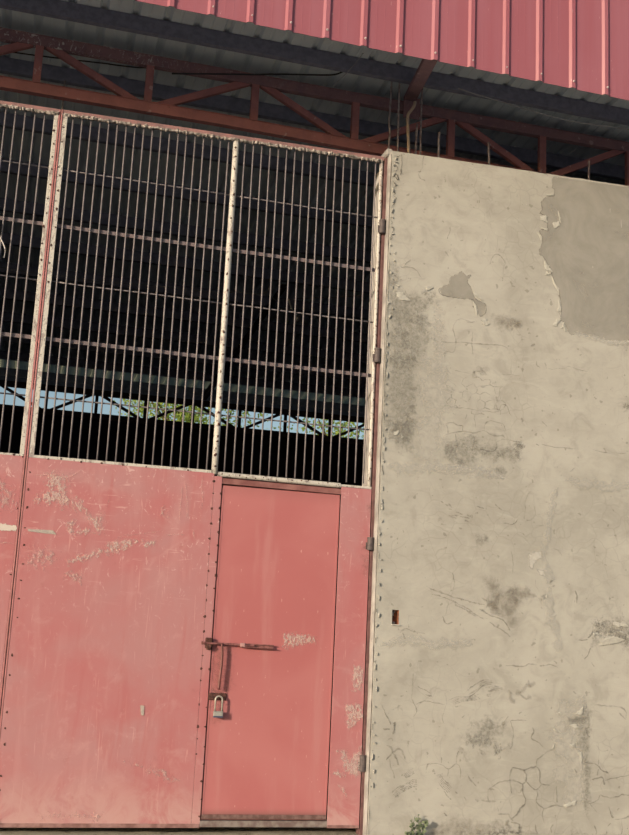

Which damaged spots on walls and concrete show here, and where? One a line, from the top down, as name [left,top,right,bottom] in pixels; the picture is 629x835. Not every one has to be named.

flaking render [386,83,402,347]
flaking render [426,272,490,326]
flaking render [537,161,629,345]
peeling [0,523,17,531]